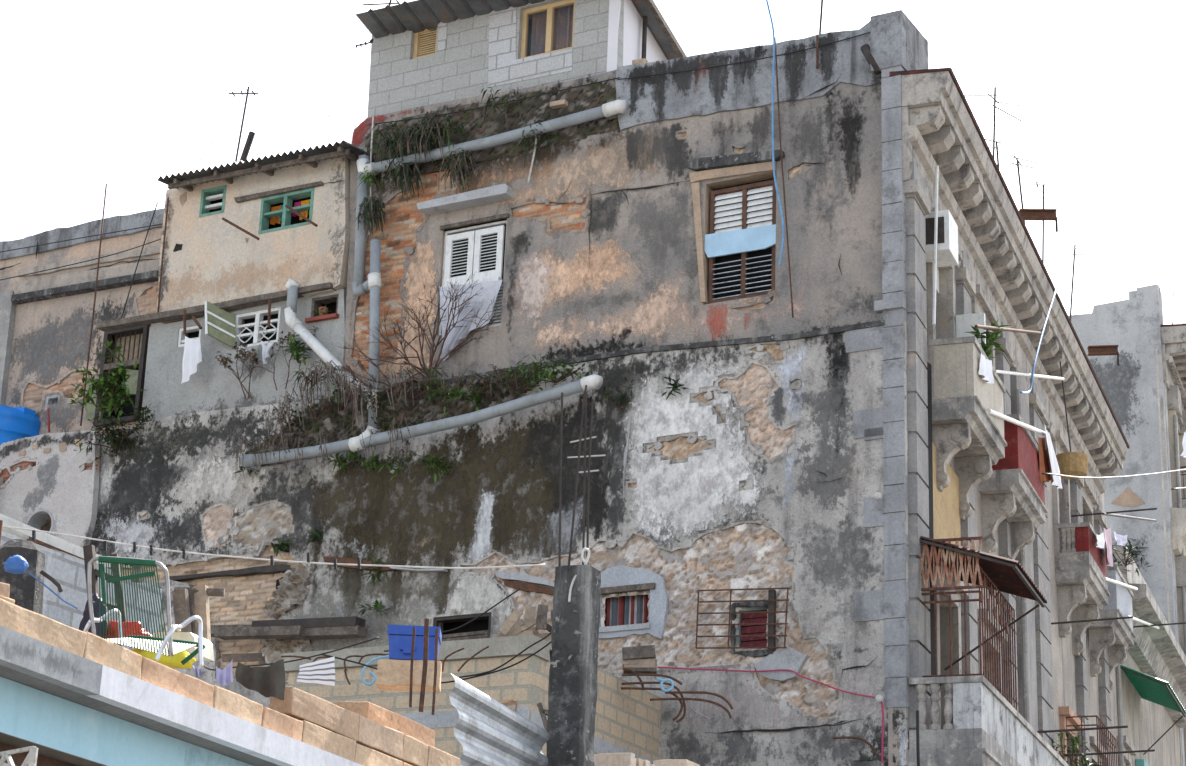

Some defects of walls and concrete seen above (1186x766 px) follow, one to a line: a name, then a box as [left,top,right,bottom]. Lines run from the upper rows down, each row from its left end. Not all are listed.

flaking render [348,169,459,378]
flaking render [507,192,591,236]
water stain [452,45,769,274]
water stain [784,32,881,206]
water stain [0,396,93,457]
water stain [85,391,322,566]
flaking render [121,495,308,682]
water stain [232,325,753,651]
flaking render [462,340,844,723]